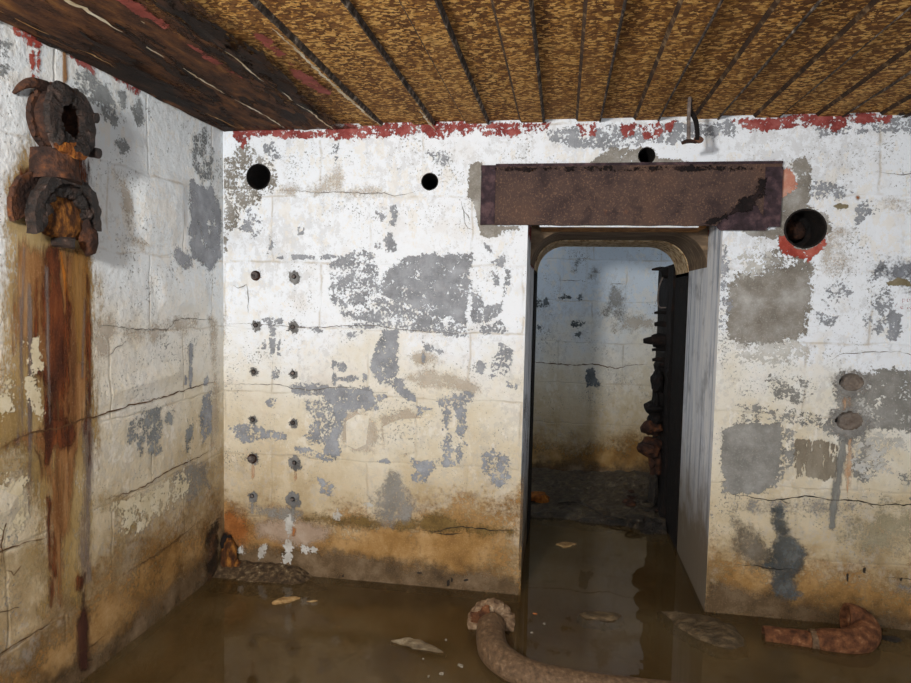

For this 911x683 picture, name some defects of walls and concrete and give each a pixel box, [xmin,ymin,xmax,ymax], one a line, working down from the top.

rust [47,51,72,106]
rust [495,164,767,226]
peeling [0,0,911,496]
rust [0,122,101,671]
crack [0,381,386,473]
peeling [111,468,193,536]
leakage [0,409,527,683]
spalling [285,491,301,521]
leakage [704,501,911,630]
crack [733,494,911,507]